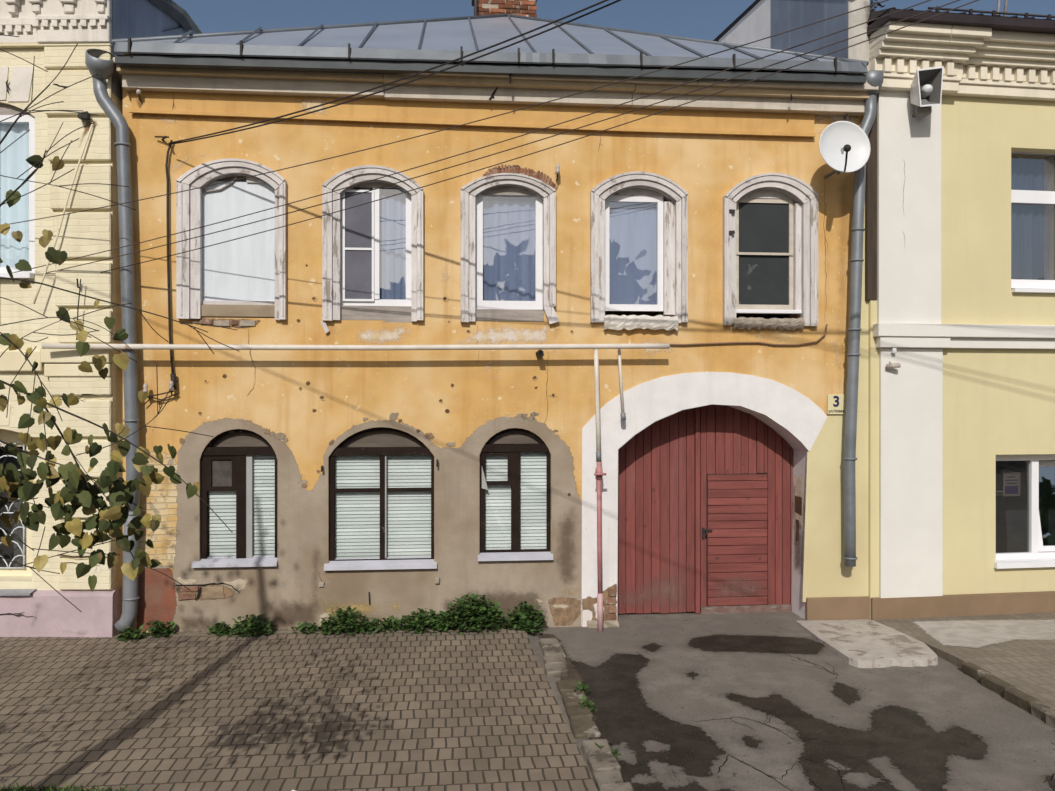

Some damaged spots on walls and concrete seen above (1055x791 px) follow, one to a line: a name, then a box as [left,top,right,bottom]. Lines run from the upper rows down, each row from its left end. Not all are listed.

spalling [483,164,558,190]
flaking render [264,428,288,443]
spalling [137,451,248,631]
damp [561,521,572,576]
spalling [538,584,620,628]